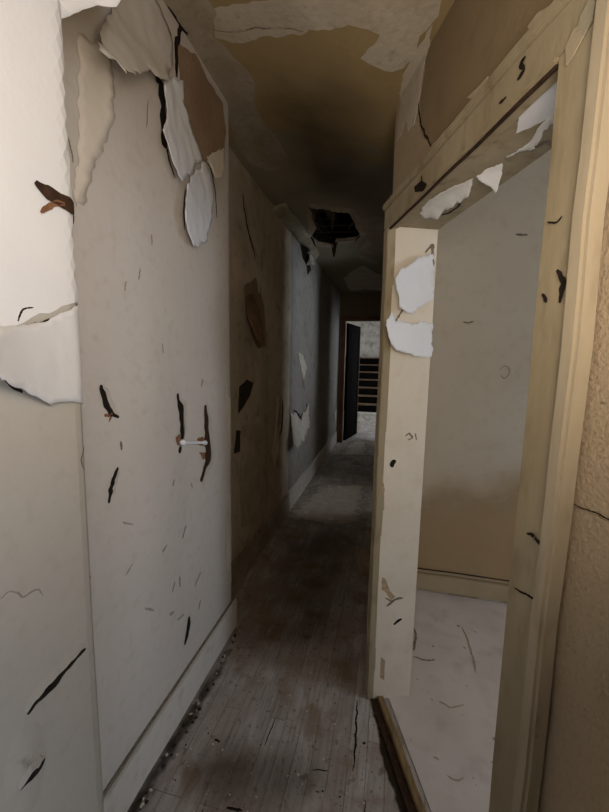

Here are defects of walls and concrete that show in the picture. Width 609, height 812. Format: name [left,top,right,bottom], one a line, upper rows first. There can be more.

peeling [565,0,596,65]
peeling [0,0,557,404]
peeling [556,269,566,303]
crack [99,385,120,422]
crack [108,441,123,503]
peeling [226,379,310,586]
crack [573,504,609,522]